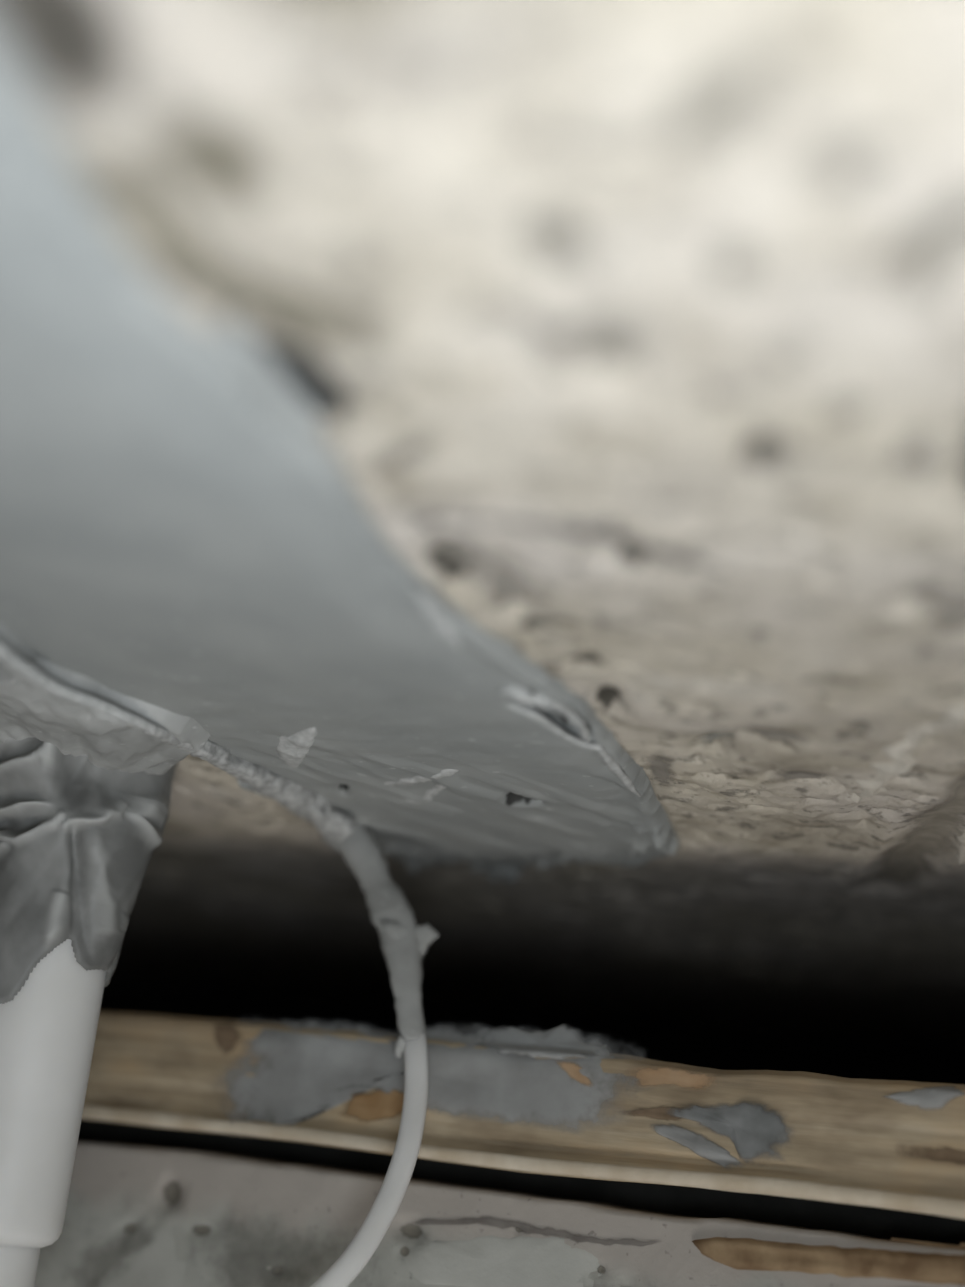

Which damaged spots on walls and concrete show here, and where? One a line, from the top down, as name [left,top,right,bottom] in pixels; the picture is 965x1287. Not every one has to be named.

spalling [427,542,535,600]